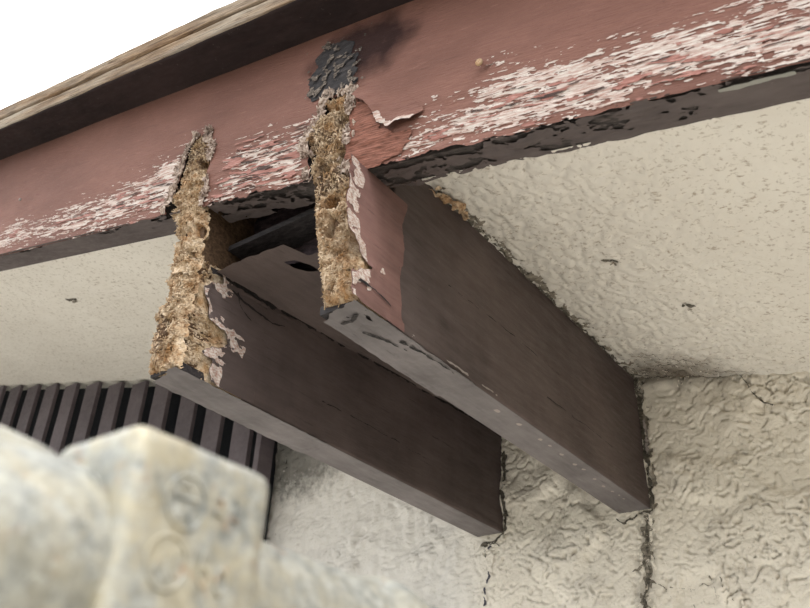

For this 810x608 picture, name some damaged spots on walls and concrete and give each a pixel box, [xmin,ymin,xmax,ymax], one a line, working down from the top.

peeling [397,0,810,161]
peeling [0,140,188,254]
crack [430,186,667,608]